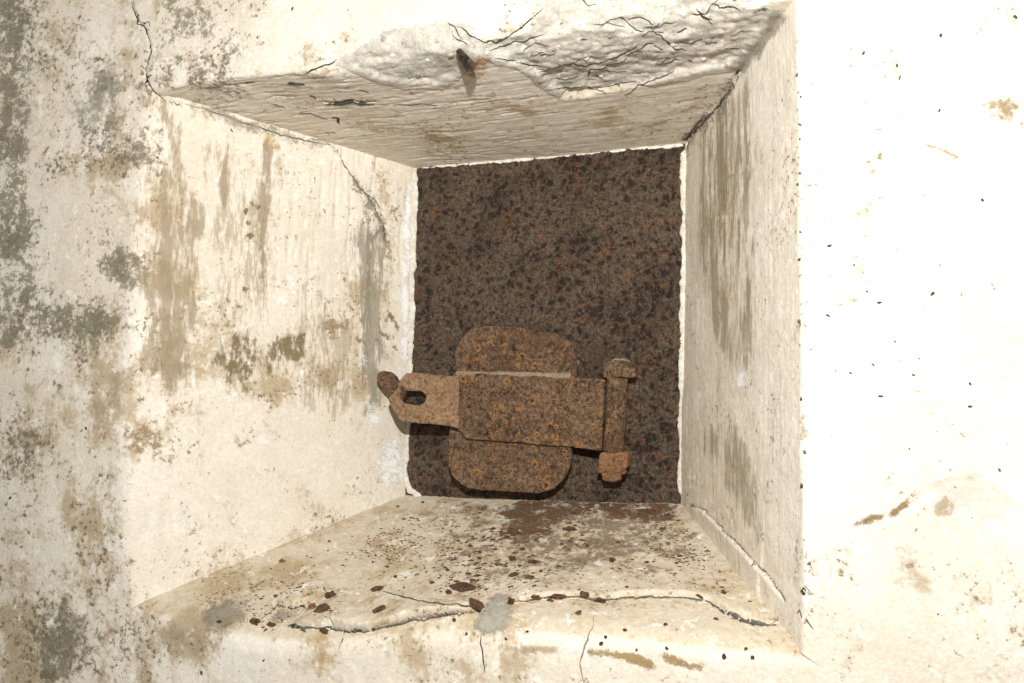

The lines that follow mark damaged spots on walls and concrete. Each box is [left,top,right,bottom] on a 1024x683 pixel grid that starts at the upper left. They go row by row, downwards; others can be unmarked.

damp [0,0,128,354]
damp [137,97,205,391]
damp [191,100,297,287]
crack [131,1,387,239]
damp [350,175,392,416]
corrosion [465,58,490,79]
damp [682,13,786,368]
damp [124,421,172,464]
corrosion [308,590,336,613]
corrosion [445,582,484,611]
crack [264,506,814,682]
corrosion [477,500,678,580]